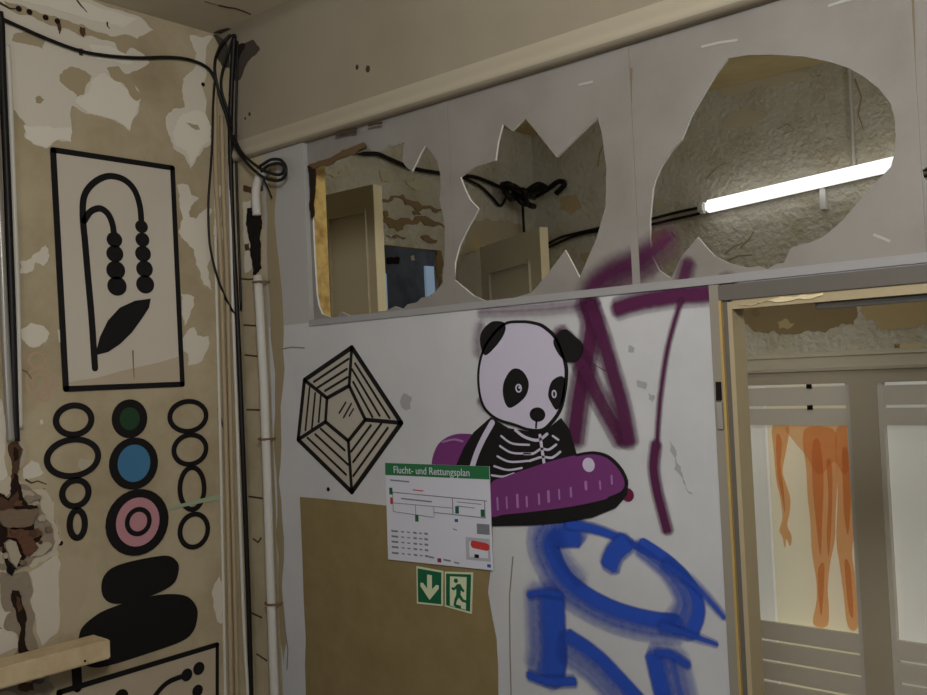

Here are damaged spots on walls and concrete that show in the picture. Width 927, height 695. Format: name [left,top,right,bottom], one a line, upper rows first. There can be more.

peeling [5,0,143,130]
peeling [24,125,72,148]
peeling [173,110,211,164]
peeling [307,142,367,220]
peeling [382,194,445,287]
peeling [460,218,526,257]
peeling [741,292,824,305]
peeling [860,301,927,331]
spalling [0,442,61,576]